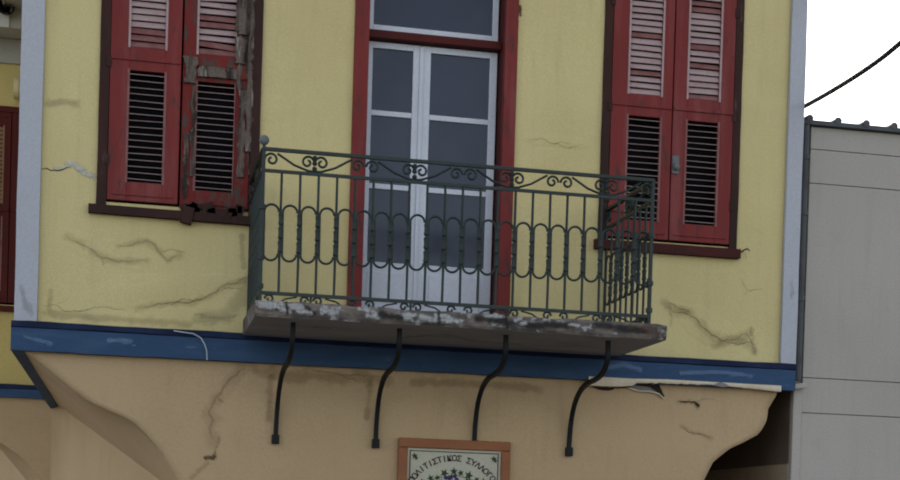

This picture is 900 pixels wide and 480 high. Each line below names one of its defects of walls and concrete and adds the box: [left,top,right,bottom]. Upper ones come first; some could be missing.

peeling [258,301,340,315]
peeling [399,313,463,323]
spalling [589,376,781,399]